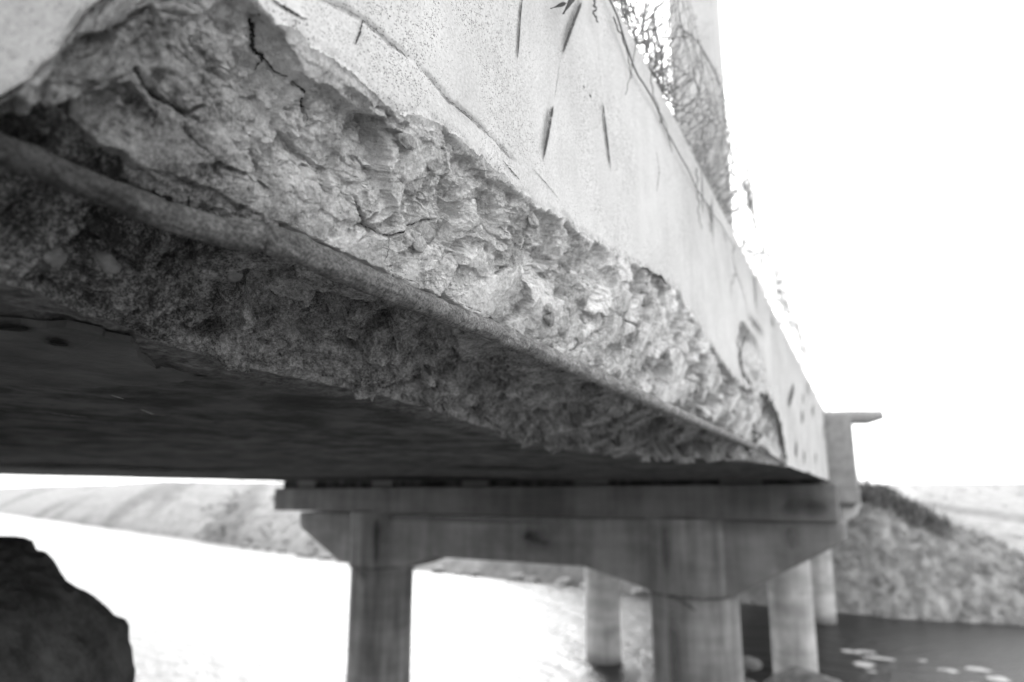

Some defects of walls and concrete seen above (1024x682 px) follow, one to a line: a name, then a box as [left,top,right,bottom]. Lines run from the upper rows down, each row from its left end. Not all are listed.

crack [247,0,309,123]
crack [324,0,557,196]
spalling [0,0,788,467]